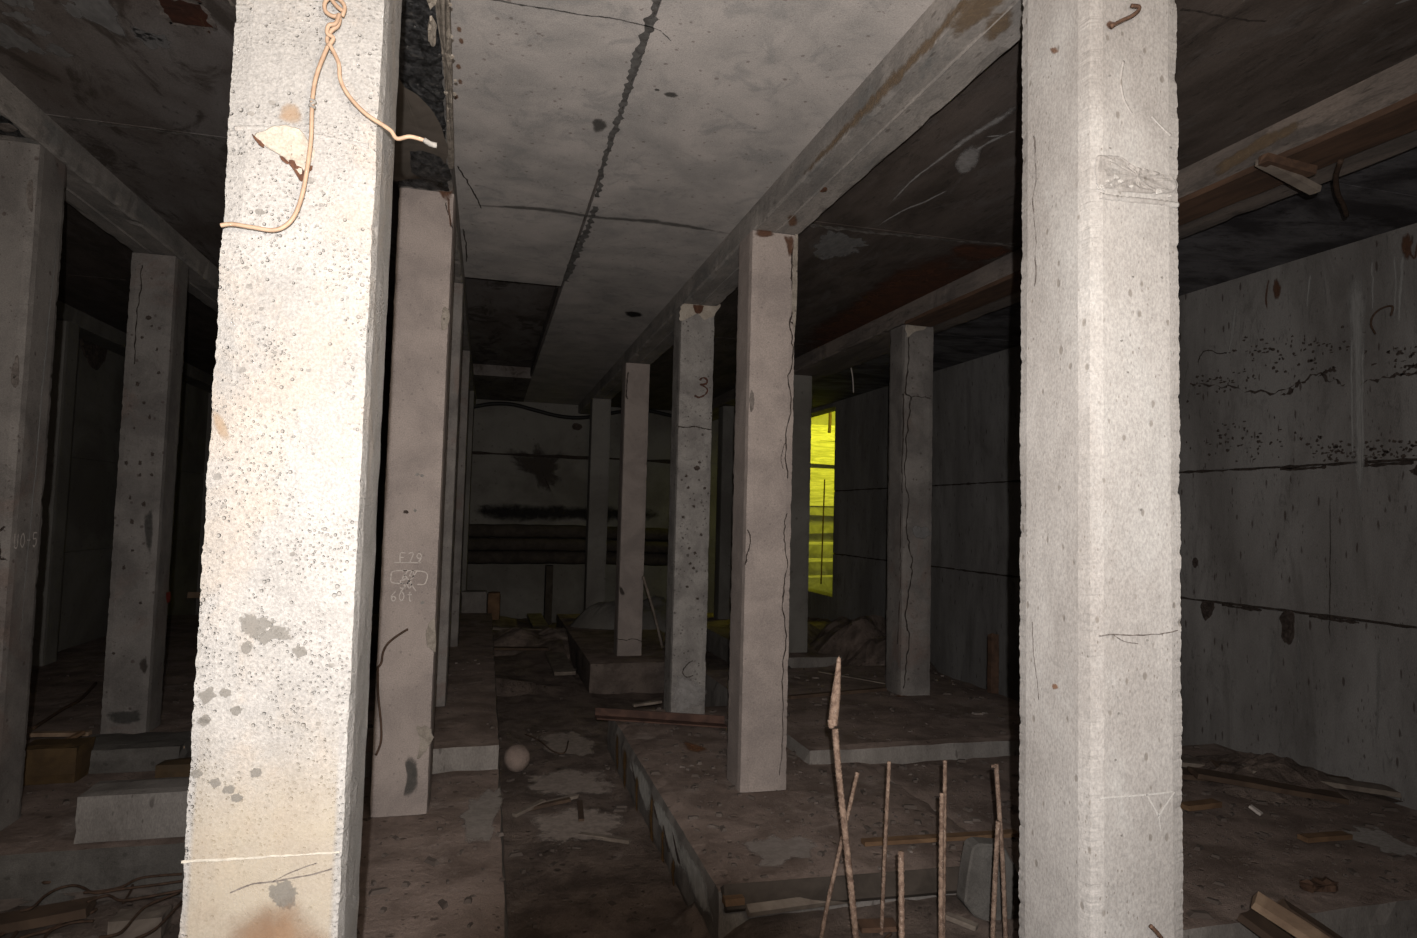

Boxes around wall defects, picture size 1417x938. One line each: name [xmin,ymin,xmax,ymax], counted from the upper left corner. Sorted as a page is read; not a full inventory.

crack [493,0,671,41]
spalling [252,125,315,184]
crack [897,326,930,688]